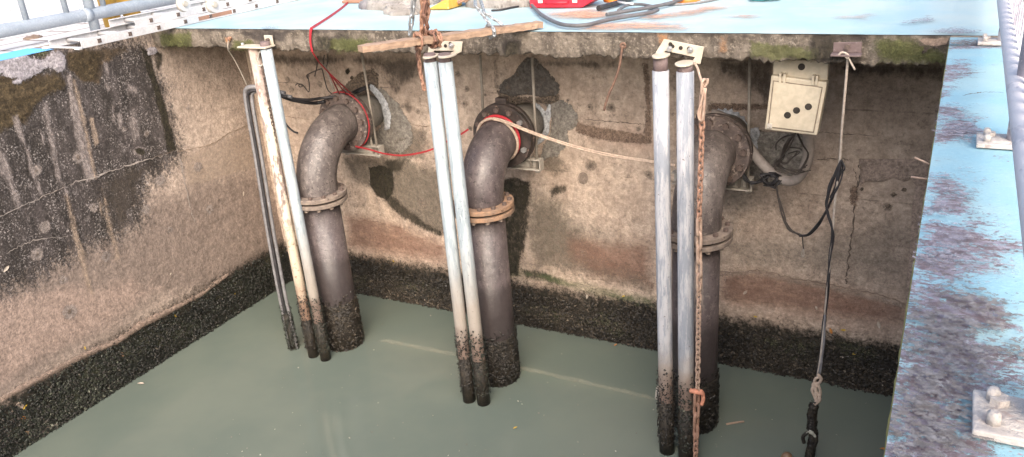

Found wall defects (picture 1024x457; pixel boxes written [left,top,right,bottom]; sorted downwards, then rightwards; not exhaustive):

damp [67,75,98,181]
damp [65,191,92,290]
crack [0,150,197,228]
crack [817,132,871,284]